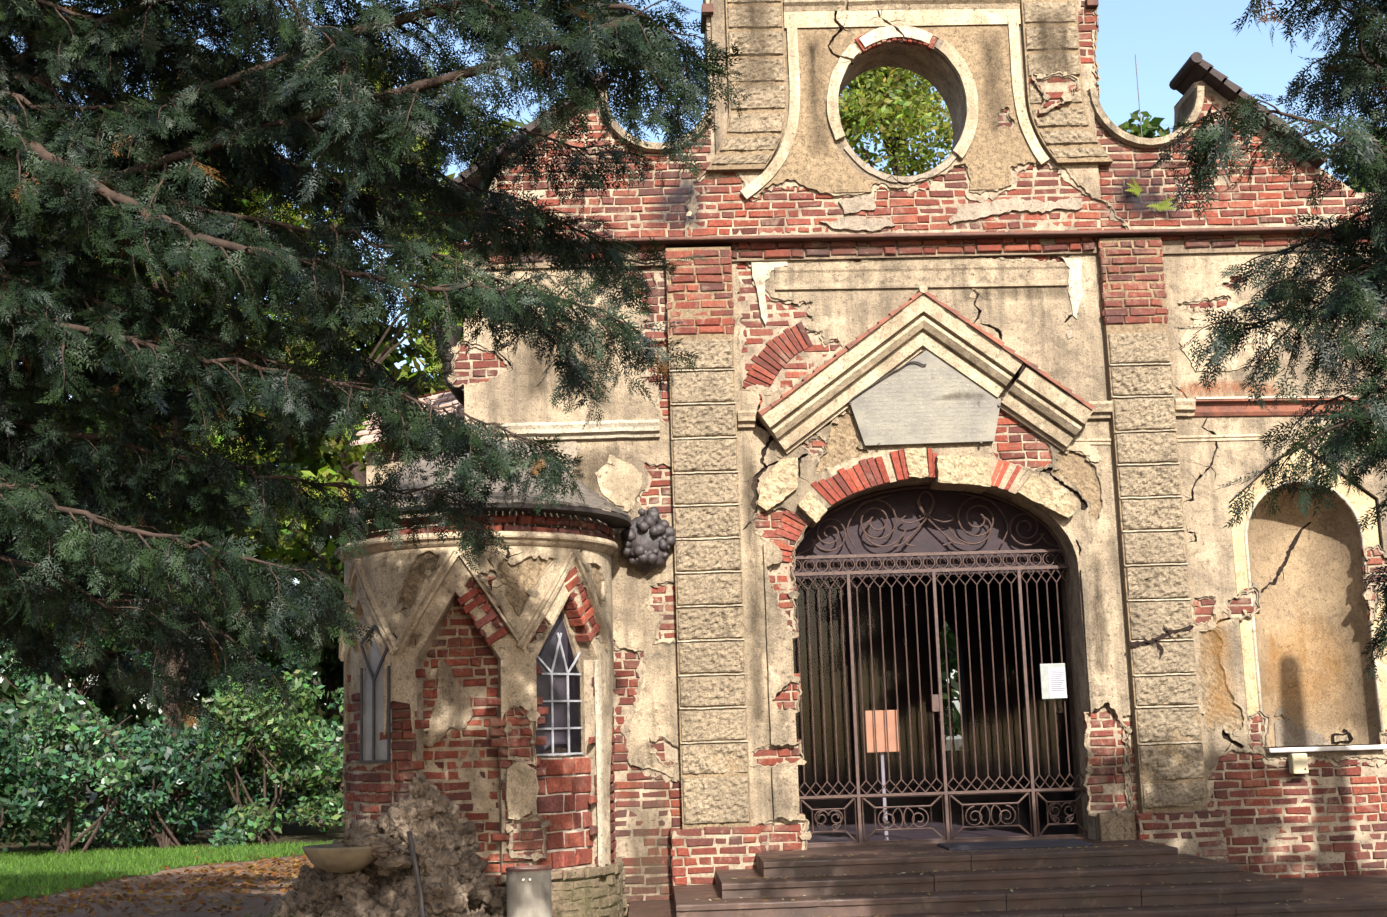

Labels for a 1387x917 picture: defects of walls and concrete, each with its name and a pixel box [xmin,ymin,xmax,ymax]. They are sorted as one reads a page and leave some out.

crack [828,13,853,65]
flaking render [1029,0,1101,117]
flaking render [684,157,1130,237]
flaking render [734,258,890,406]
crack [743,405,830,530]
flaking render [799,408,875,476]
crack [1177,384,1221,542]
flaking render [464,553,556,652]
crack [1130,522,1311,659]
flaking render [576,563,682,916]
flaking render [1083,702,1139,816]
flaking render [1191,582,1387,878]